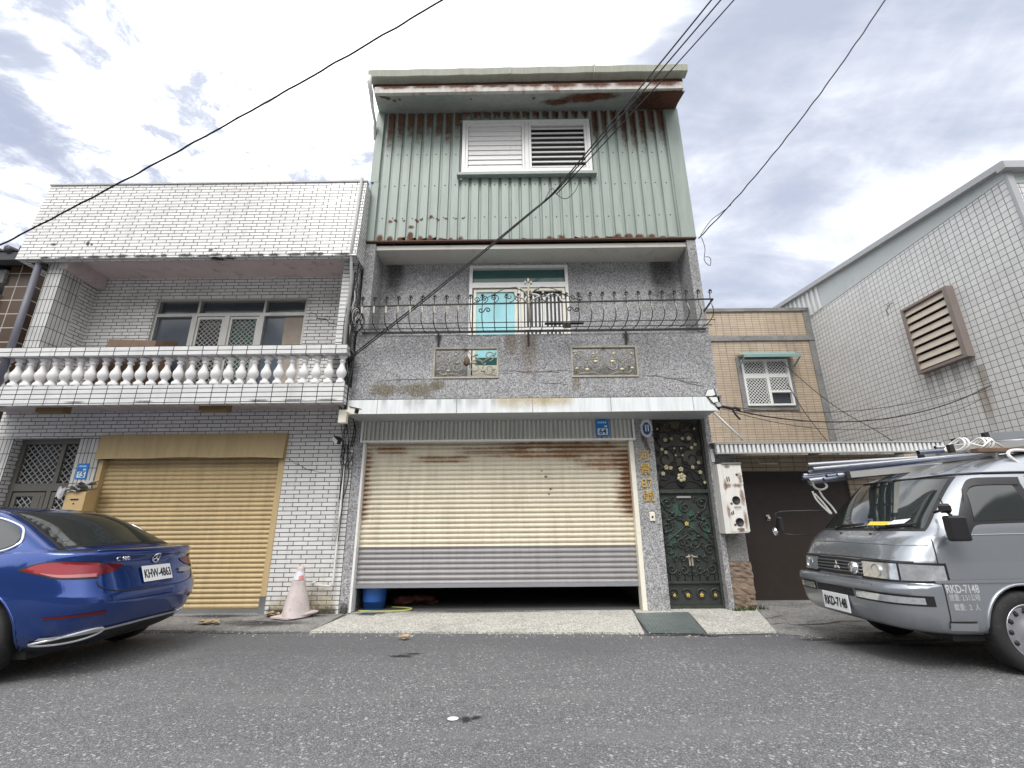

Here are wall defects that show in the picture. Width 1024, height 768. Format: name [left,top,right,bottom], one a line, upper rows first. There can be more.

corrosion [379,82,685,147]
corrosion [377,215,464,240]
corrosion [362,448,405,516]
corrosion [421,442,633,513]